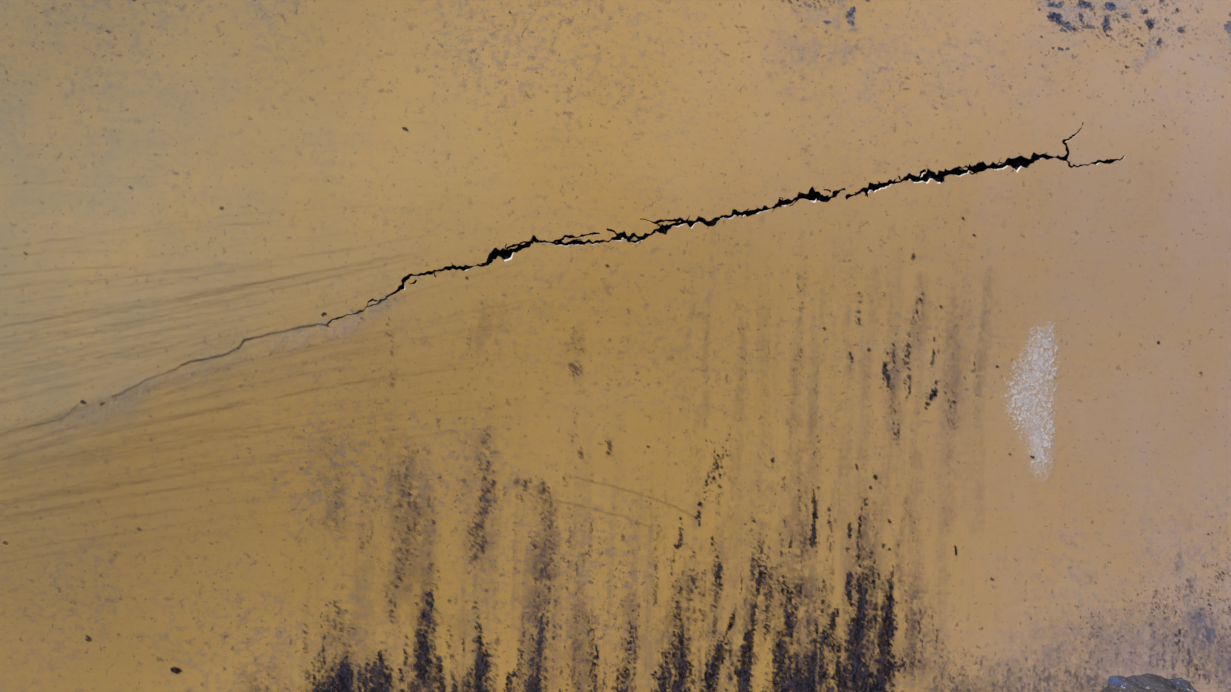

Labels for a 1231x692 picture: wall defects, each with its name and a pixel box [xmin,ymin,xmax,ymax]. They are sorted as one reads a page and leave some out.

peeling [782,0,869,26]
peeling [1039,0,1178,46]
crack [181,123,1125,366]
water stain [882,333,910,394]
water stain [469,426,495,564]
water stain [301,461,639,692]
water stain [651,439,920,692]